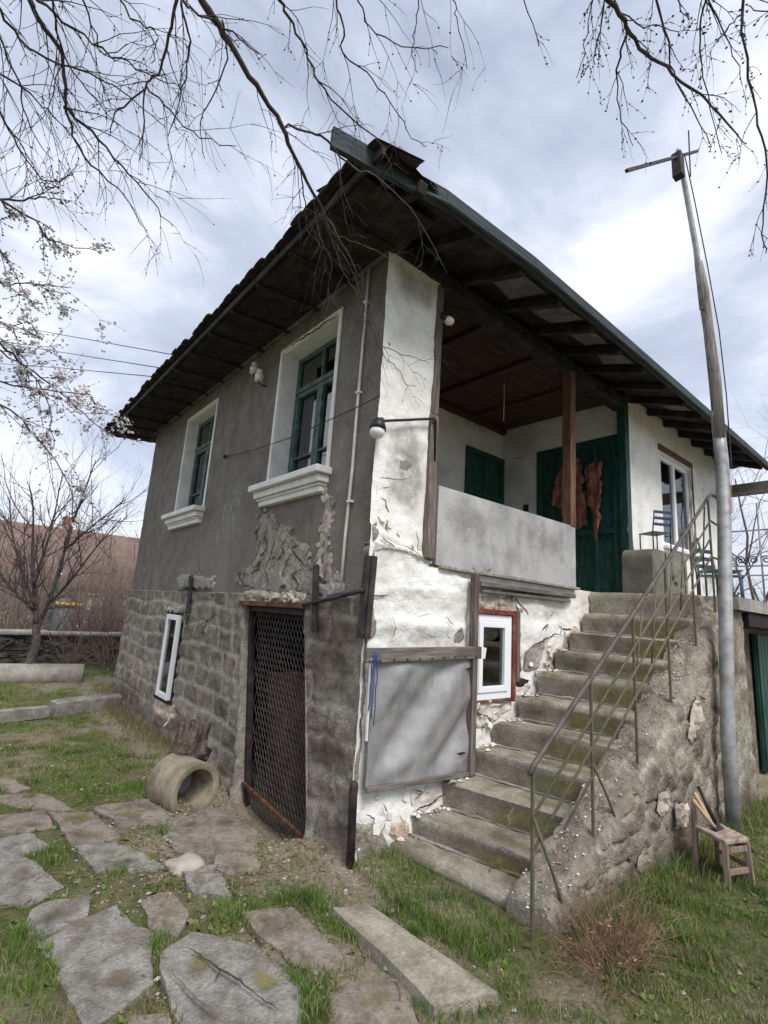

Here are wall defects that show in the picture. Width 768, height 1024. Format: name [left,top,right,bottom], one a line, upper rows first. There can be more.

crack [381,453,419,533]
spalling [234,486,345,603]
spalling [476,626,578,729]
flaking render [356,781,446,861]
crack [172,947,278,1019]